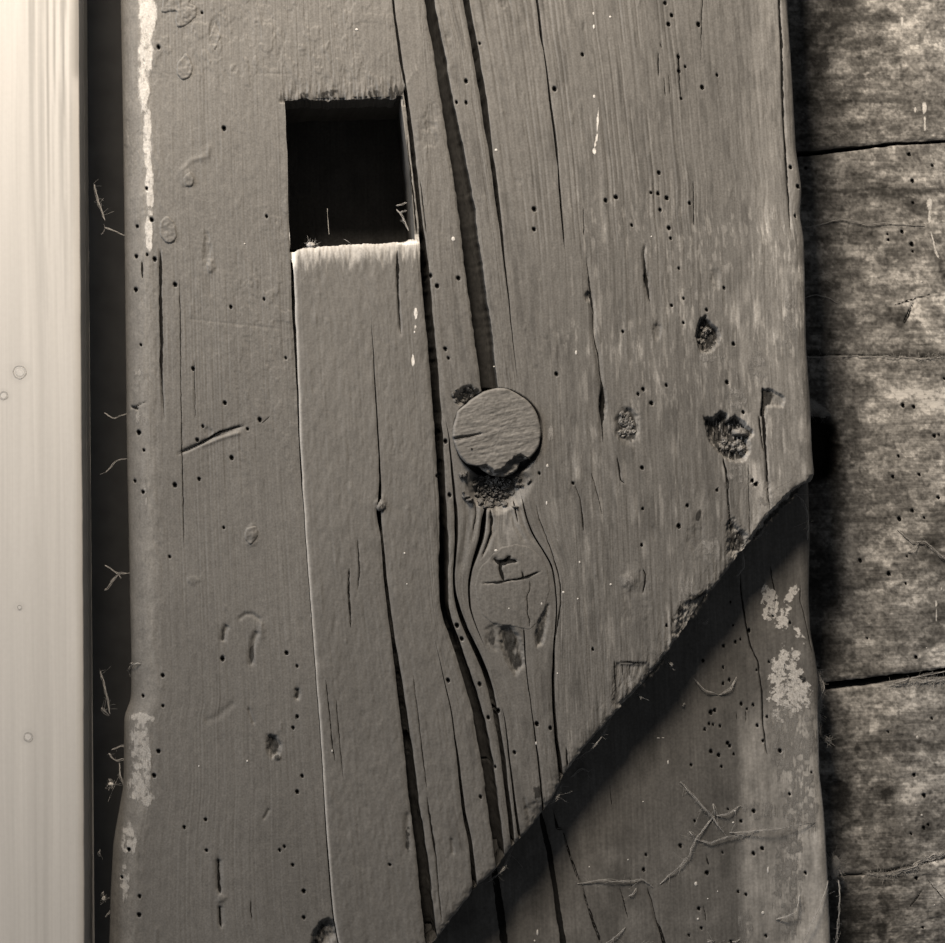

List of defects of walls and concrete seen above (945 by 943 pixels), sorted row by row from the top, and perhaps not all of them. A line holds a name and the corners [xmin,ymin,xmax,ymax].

crack [132,253,269,542]
crack [392,0,602,943]
crack [586,260,624,483]
crack [620,879,665,943]